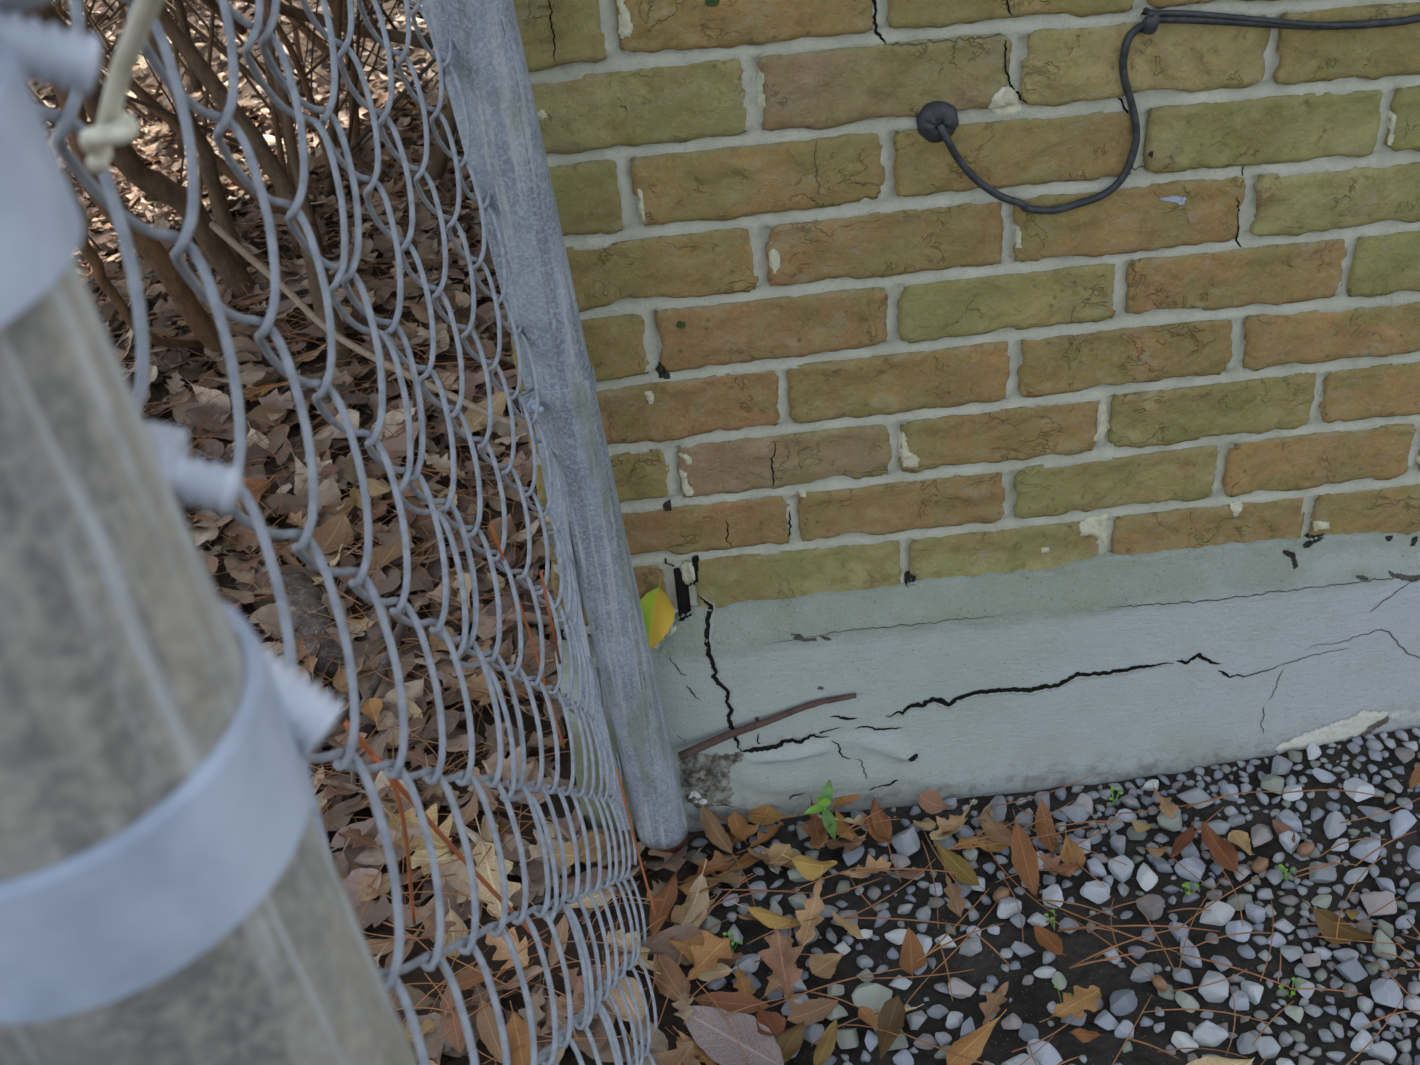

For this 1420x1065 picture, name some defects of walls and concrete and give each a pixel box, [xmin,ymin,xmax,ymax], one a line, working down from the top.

crack [872,0,1027,104]
crack [670,575,1420,790]
spalling [678,752,743,808]